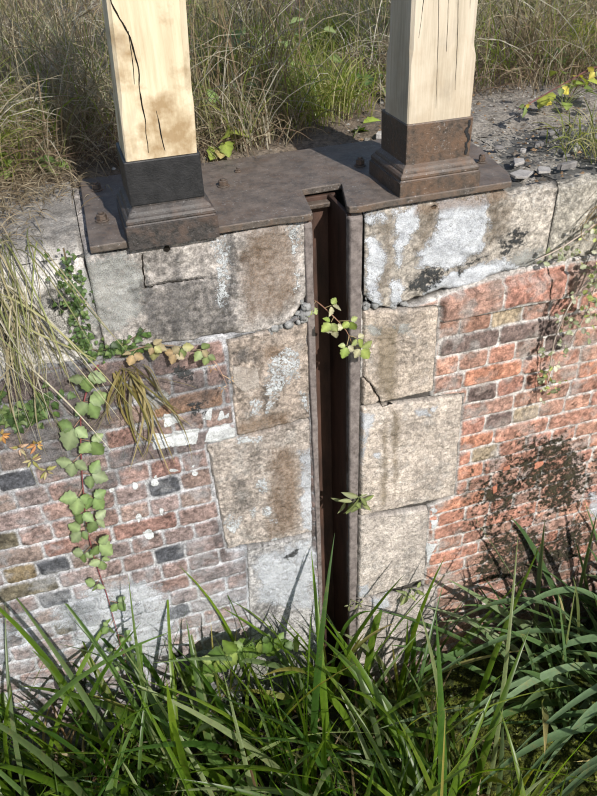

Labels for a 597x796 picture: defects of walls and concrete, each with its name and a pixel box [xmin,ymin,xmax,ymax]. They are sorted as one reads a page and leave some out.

crack [110,0,165,153]